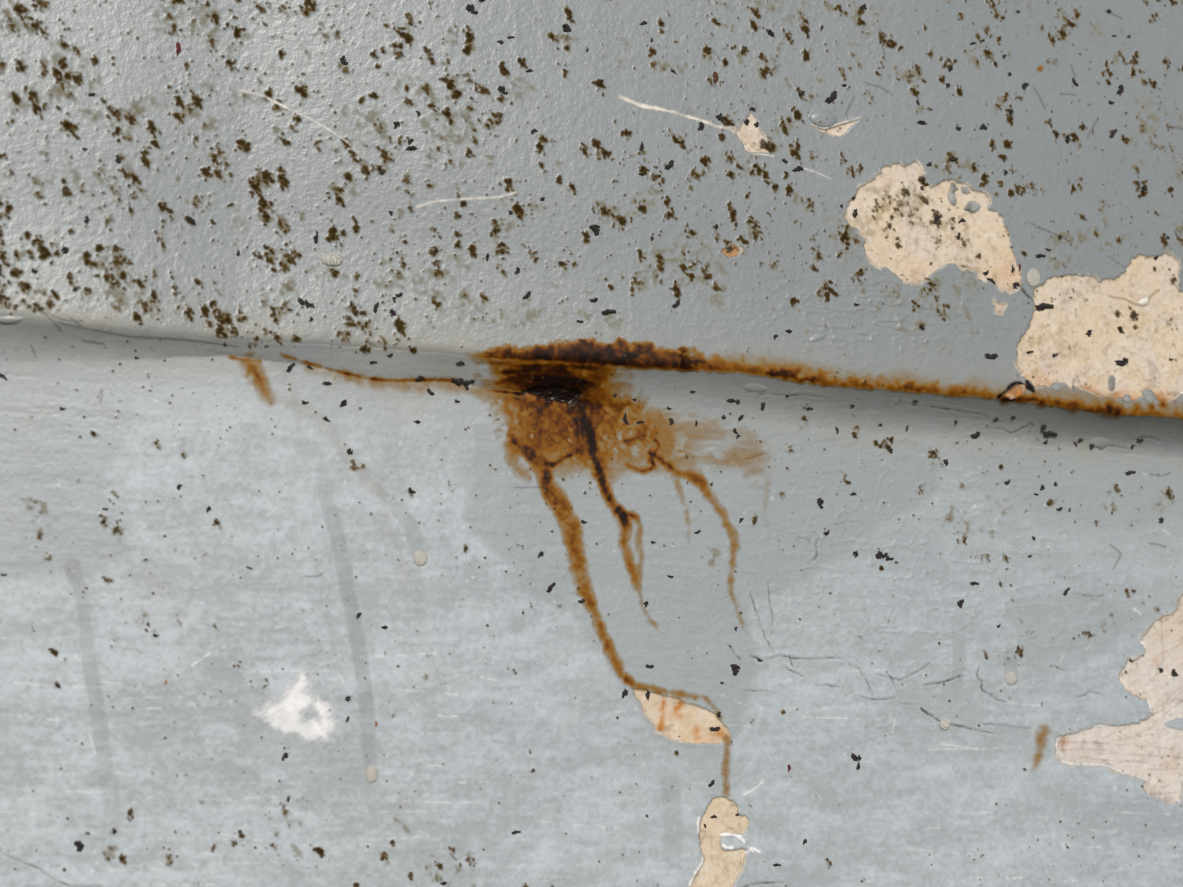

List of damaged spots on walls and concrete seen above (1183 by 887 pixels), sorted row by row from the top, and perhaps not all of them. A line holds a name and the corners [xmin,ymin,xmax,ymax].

peeling [730,113,774,157]
peeling [844,160,1021,314]
peeling [1005,253,1183,404]
rust [229,354,272,402]
rust [281,336,1183,718]
peeling [633,689,731,744]
rust [722,736,731,795]
rust [1035,727,1048,764]
peeling [1054,594,1183,804]
peeling [688,797,761,887]